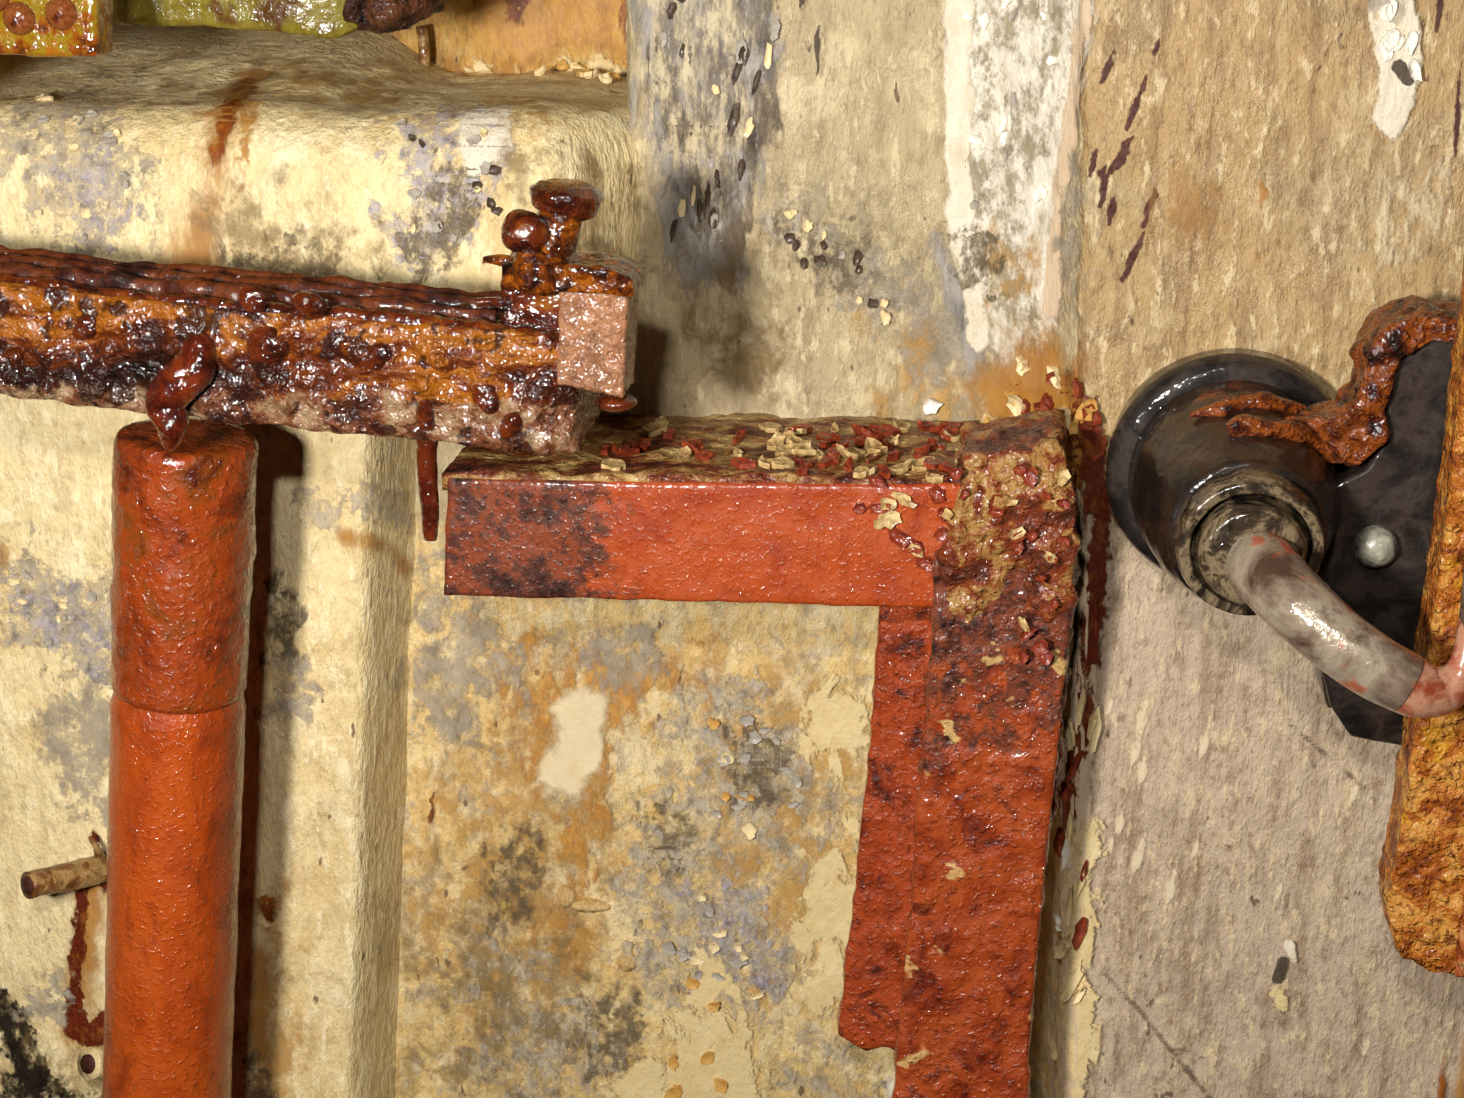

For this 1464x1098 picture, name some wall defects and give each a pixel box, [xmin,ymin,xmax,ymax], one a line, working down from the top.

corrosion [201,69,275,178]
spalling [1368,0,1443,139]
corrosion [171,195,217,266]
corrosion [599,345,1107,572]
peeling [1009,526,1026,540]
peeling [290,481,529,760]
peeling [1018,615,1030,632]
peeling [1049,417,1113,1098]
damp [0,967,103,1098]
corrosion [63,882,107,1047]
damp [439,826,584,1052]
peeling [449,624,895,1098]